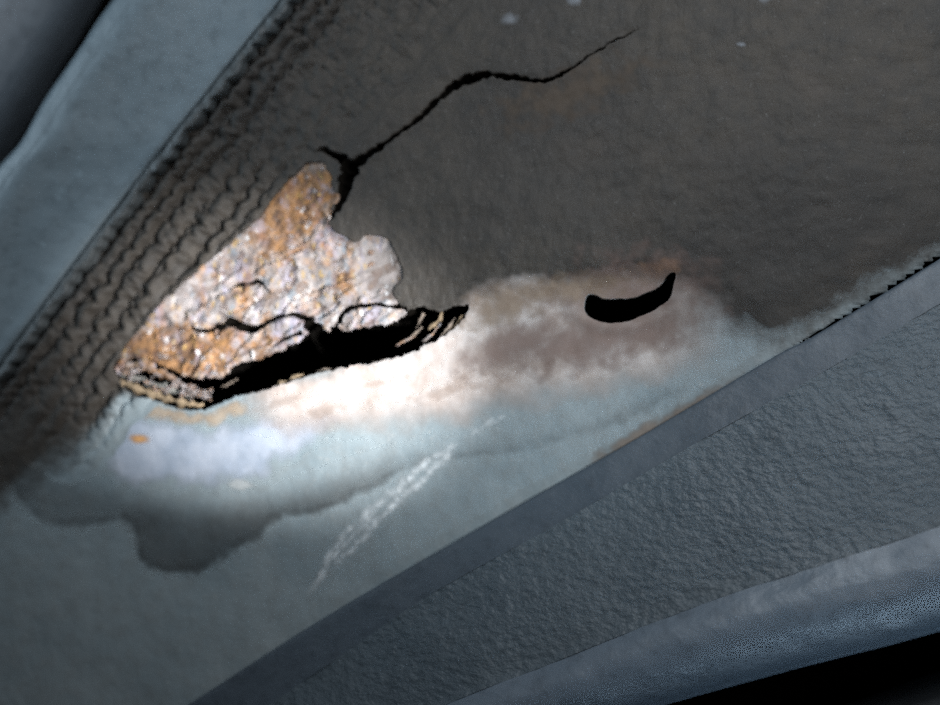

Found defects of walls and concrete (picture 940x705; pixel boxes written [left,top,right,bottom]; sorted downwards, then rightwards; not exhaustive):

crack [322,38,623,221]
peeling [0,0,471,478]
corrosion [114,162,407,379]
efflorescence [113,420,316,489]
damp [319,454,449,580]